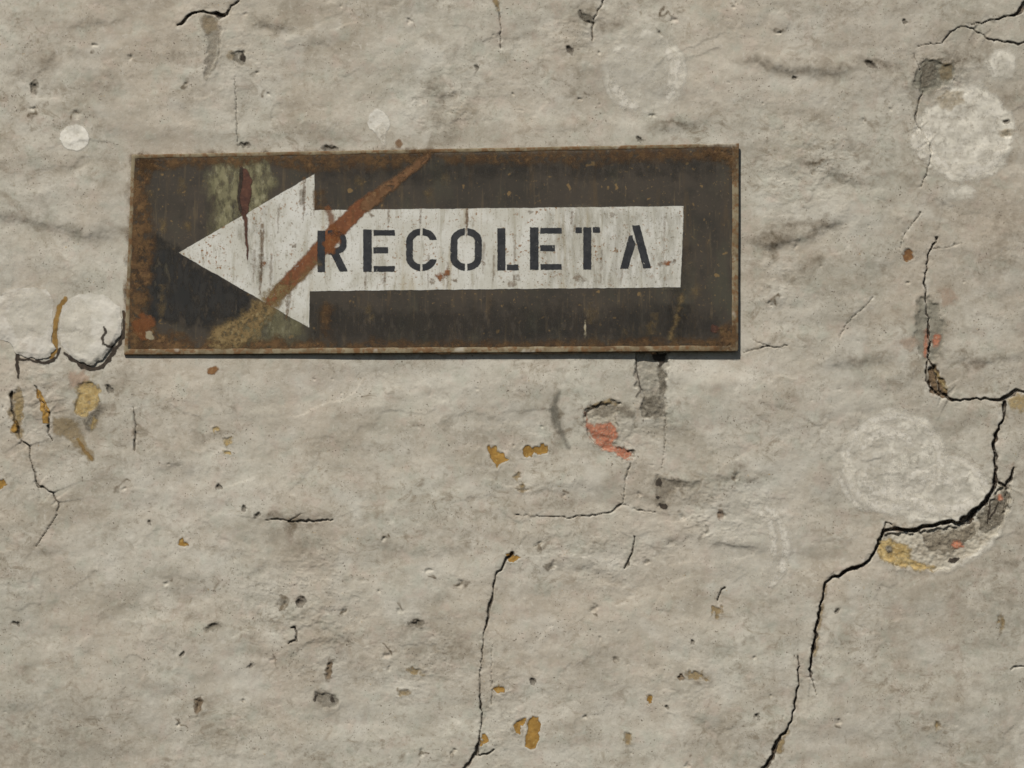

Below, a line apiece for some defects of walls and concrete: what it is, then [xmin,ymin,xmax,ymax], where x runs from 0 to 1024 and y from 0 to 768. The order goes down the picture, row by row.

crack [177,2,237,26]
crack [953,2,1024,45]
spalling [914,60,954,93]
damp [910,49,1018,200]
peeling [49,296,67,359]
crack [10,310,126,540]
spalling [583,399,634,460]
spalling [635,352,667,418]
crack [764,241,1017,768]
damp [838,408,991,526]
spalling [877,485,1012,572]
crack [467,552,514,766]